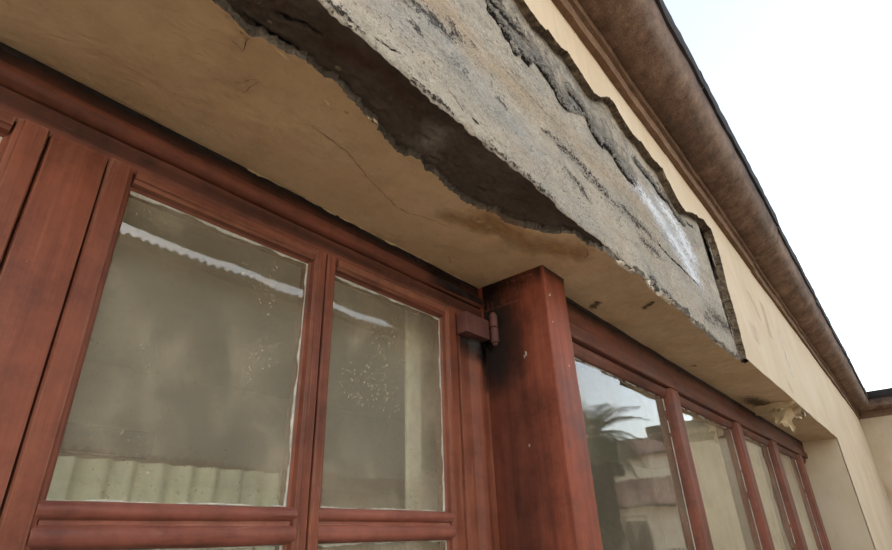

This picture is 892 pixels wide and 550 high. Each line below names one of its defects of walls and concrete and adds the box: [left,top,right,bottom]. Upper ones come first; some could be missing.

spalling [212,0,747,363]
crack [487,0,717,271]
crack [657,241,699,286]